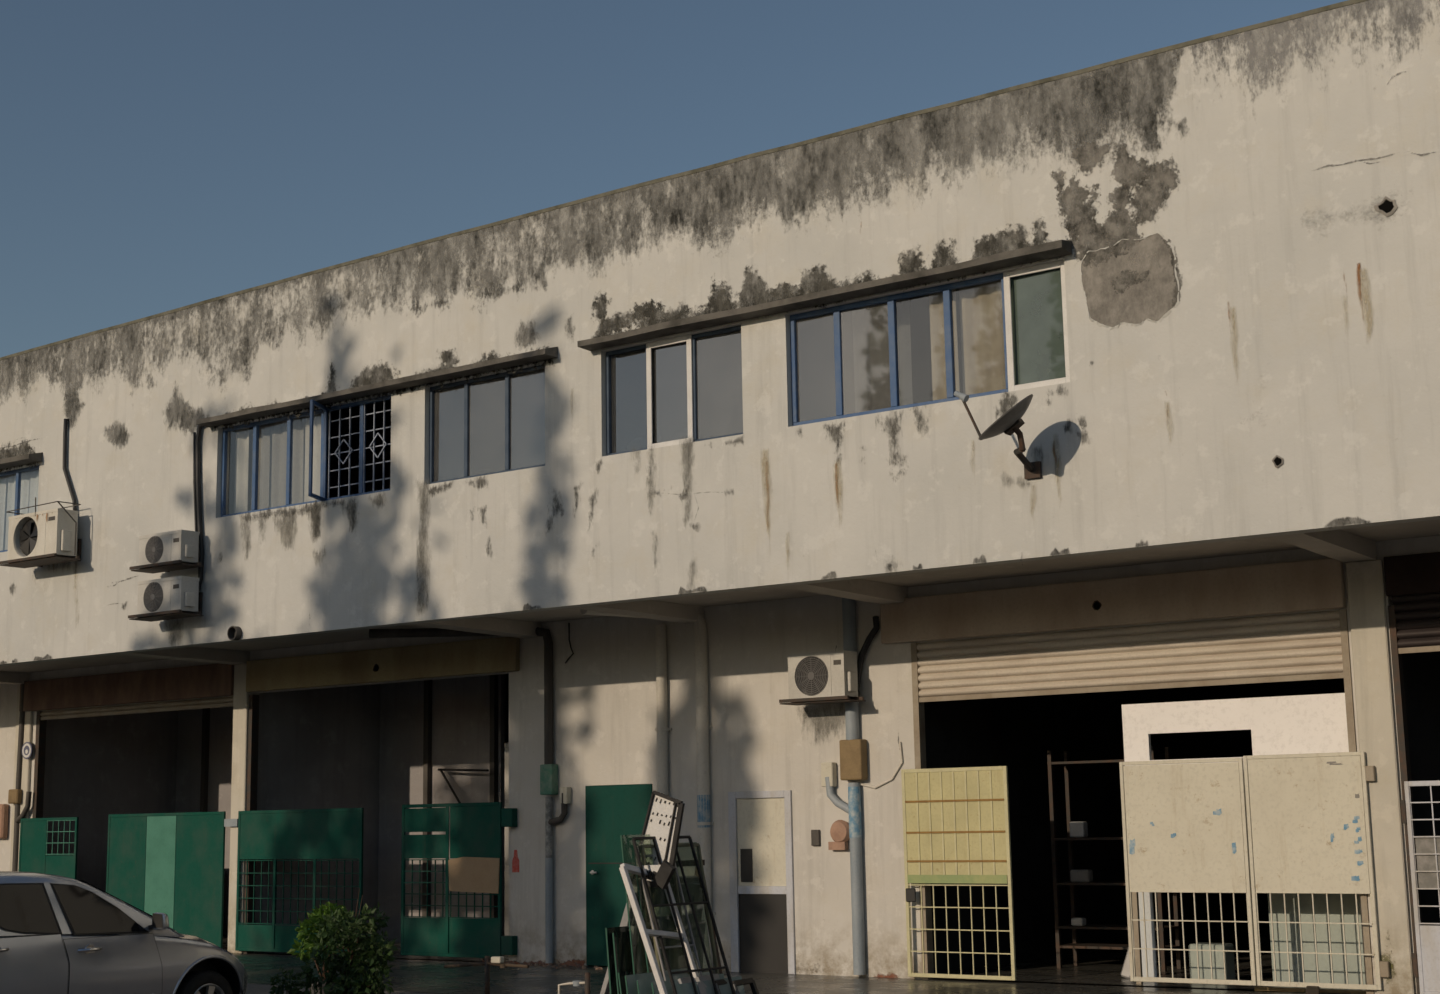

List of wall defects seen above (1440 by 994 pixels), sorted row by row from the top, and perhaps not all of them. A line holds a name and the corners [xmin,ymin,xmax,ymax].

water stain [0,0,1432,433]
peeling [1052,141,1182,330]
spalling [1374,196,1397,217]
corrosion [1357,263,1372,332]
water stain [105,425,128,448]
water stain [826,425,842,461]
water stain [886,411,922,459]
water stain [680,439,692,521]
water stain [245,500,356,556]
water stain [417,483,451,611]
water stain [803,706,843,740]